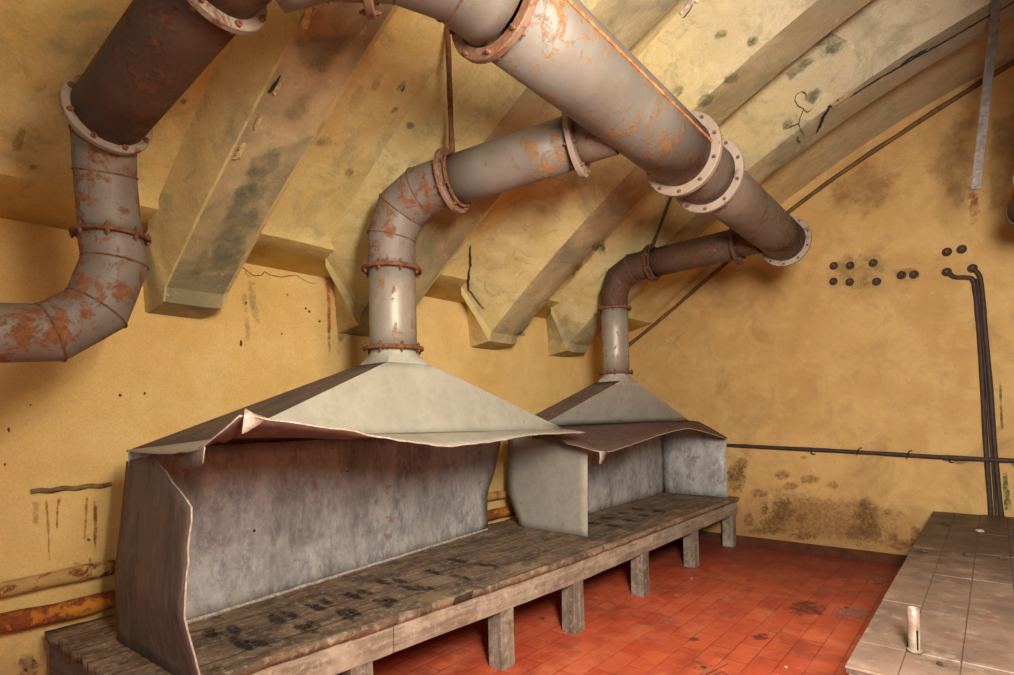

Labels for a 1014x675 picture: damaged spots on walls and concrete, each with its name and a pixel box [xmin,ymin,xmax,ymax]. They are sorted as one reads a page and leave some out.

crack [787,1,1014,143]
water stain [215,149,280,265]
rust [85,498,97,544]